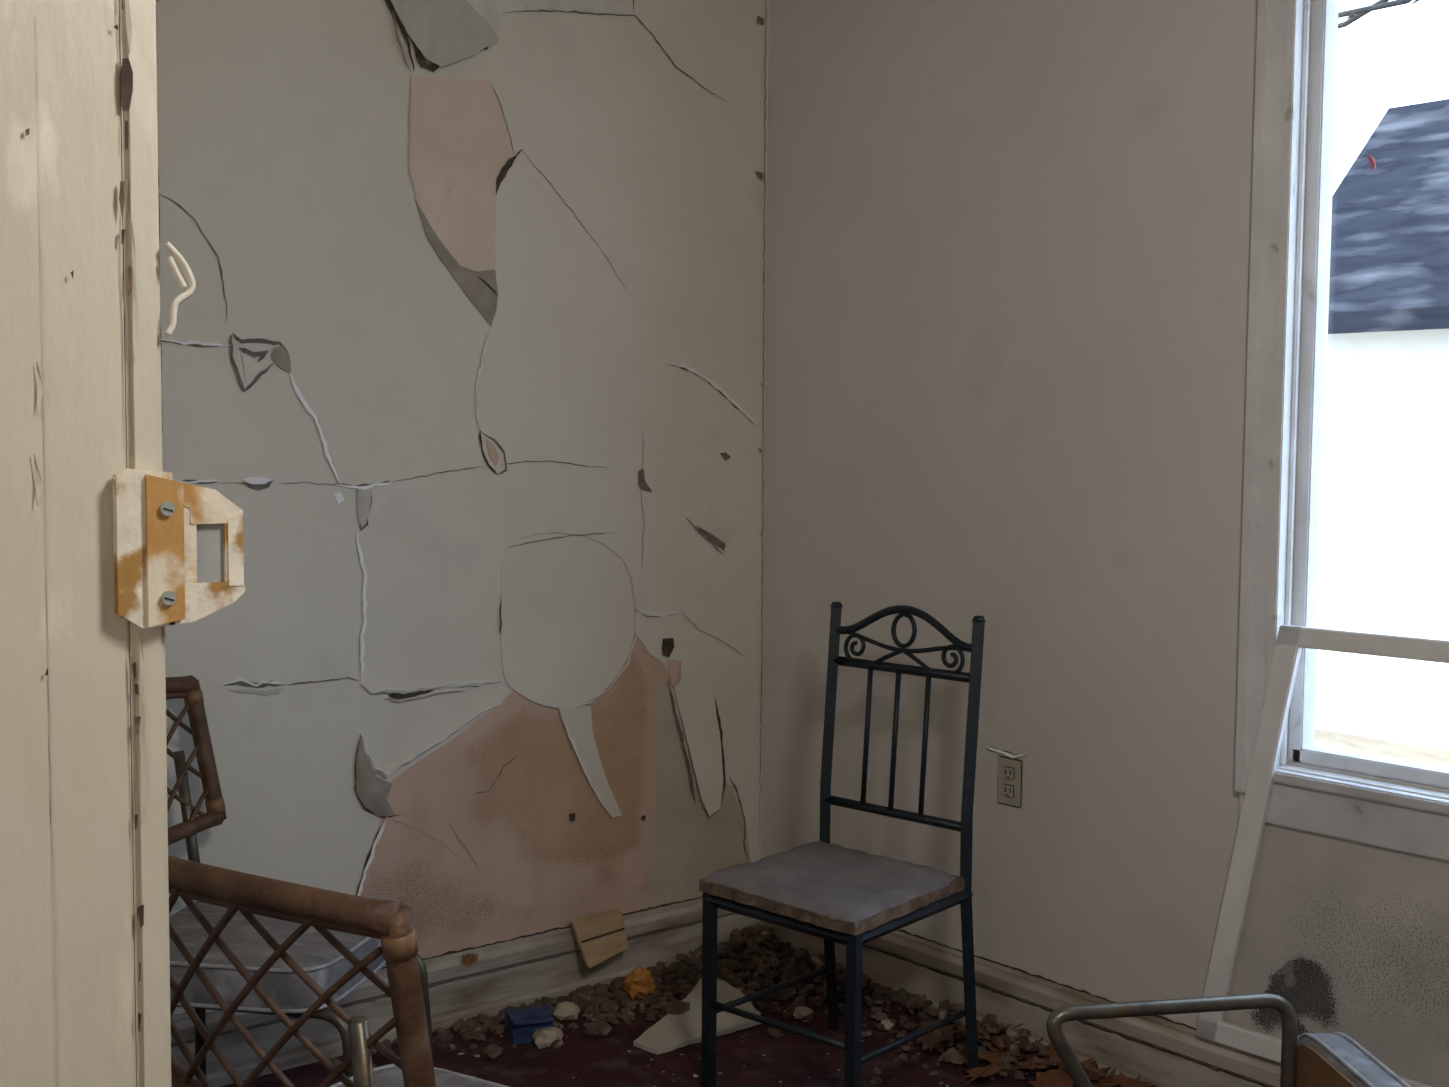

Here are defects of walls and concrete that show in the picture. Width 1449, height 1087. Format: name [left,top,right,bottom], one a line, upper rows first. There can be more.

crack [158,171,230,430]
crack [173,477,220,485]
crack [224,372,652,703]
peeling [385,0,634,326]
crack [636,1,767,846]
peeling [355,633,751,958]
leakage [1243,844,1449,1080]